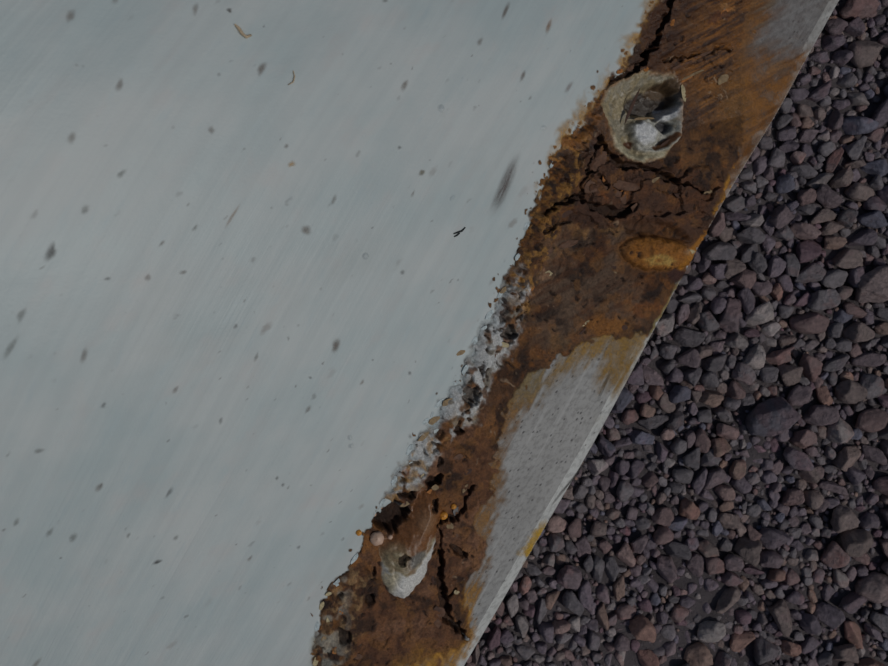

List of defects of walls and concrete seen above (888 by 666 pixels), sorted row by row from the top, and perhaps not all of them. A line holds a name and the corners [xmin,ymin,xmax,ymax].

crack [543,135,709,234]
spalling [601,70,687,164]
crack [605,0,731,90]
peeling [384,265,533,504]
corrosion [311,0,807,666]
crack [436,484,476,642]